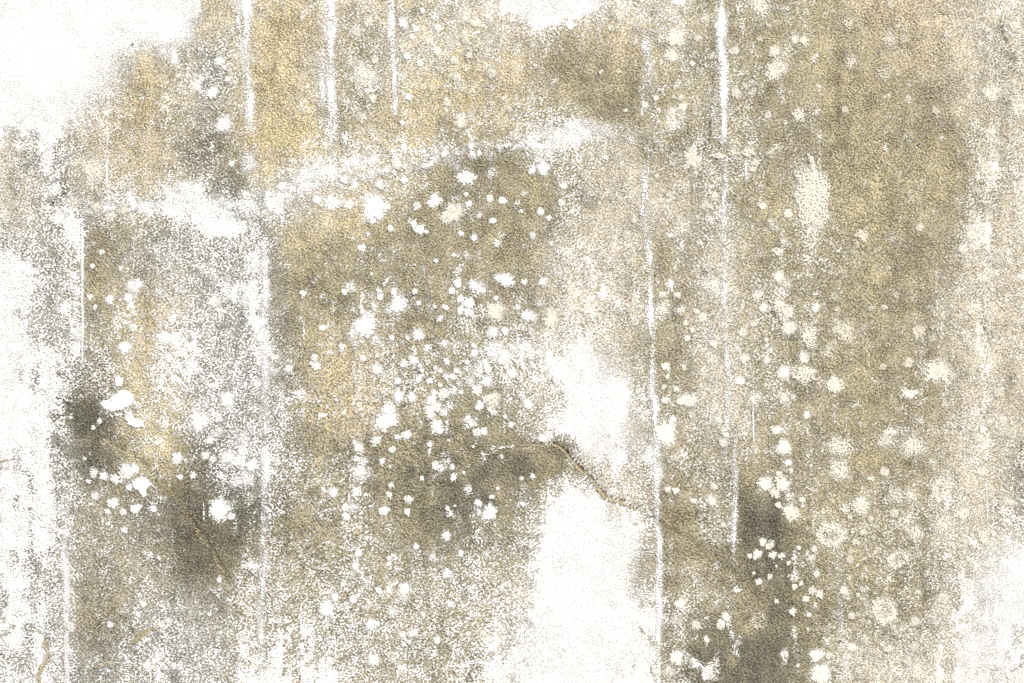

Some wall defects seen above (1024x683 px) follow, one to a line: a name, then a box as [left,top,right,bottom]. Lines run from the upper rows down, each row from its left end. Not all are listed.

damp [0,445,37,494]
crack [468,432,771,605]
damp [0,583,40,683]